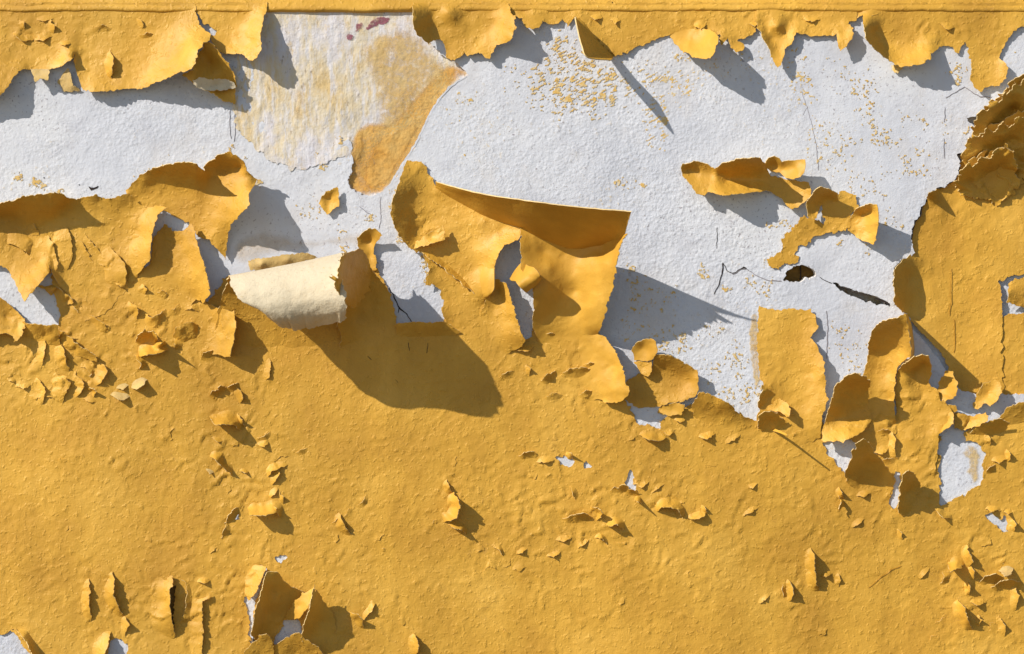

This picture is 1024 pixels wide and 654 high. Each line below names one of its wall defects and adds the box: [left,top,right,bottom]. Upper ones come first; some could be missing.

peeling [0,0,1024,520]
crack [714,234,780,294]
crack [820,277,890,305]
peeling [221,447,308,539]
peeling [331,513,352,536]
peeling [546,507,625,558]
peeling [985,505,1017,532]
peeling [244,555,287,643]
peeling [347,600,376,629]
peeling [108,638,128,654]
peeling [274,619,302,645]
peeling [408,634,419,654]